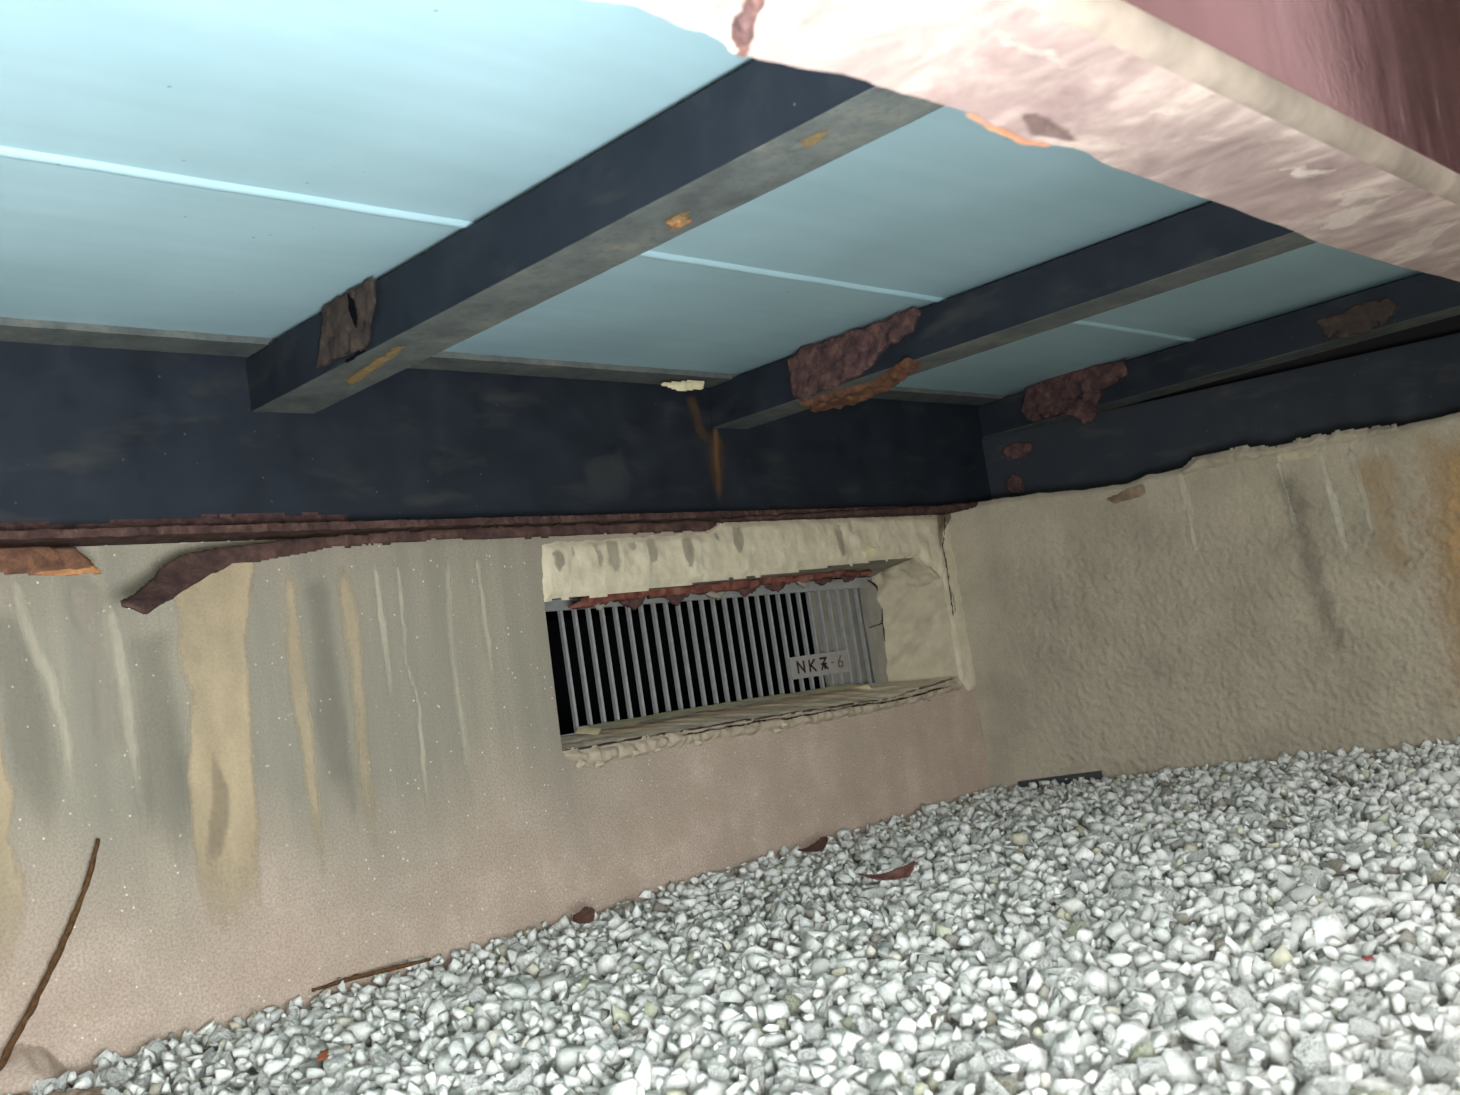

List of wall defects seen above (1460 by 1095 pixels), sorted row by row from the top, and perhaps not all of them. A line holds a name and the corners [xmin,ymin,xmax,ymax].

peeling [1024,115,1072,141]
corrosion [315,277,403,385]
corrosion [689,398,722,489]
corrosion [787,307,923,412]
corrosion [1021,358,1127,424]
corrosion [0,502,978,614]
spalling [568,569,872,611]
leakage [176,562,258,904]
leakage [286,579,319,827]
leakage [0,748,22,921]